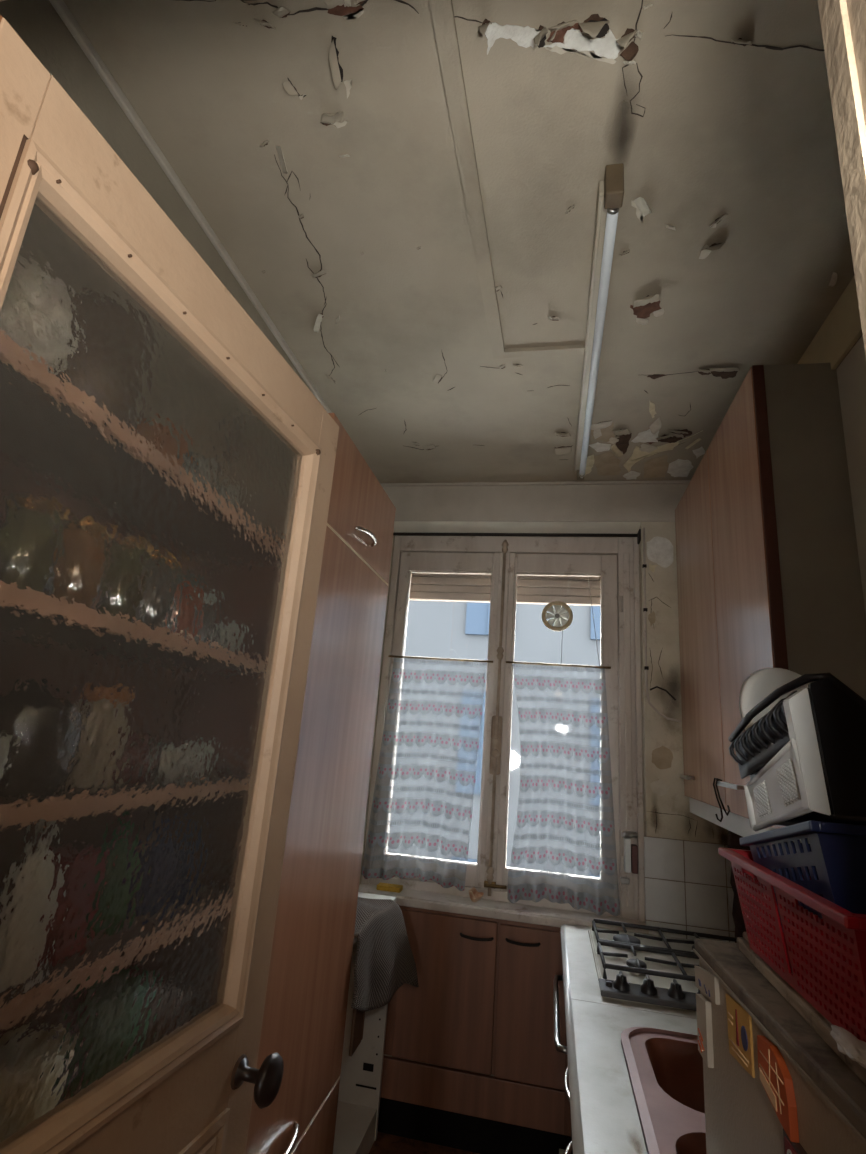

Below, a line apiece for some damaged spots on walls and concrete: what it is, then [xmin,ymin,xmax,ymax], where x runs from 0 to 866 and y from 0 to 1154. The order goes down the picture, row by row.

peeling [234,0,368,29]
peeling [454,14,639,64]
crack [622,0,824,117]
peeling [631,197,652,222]
crack [259,140,340,384]
flaking render [630,294,664,319]
peeling [585,390,705,480]